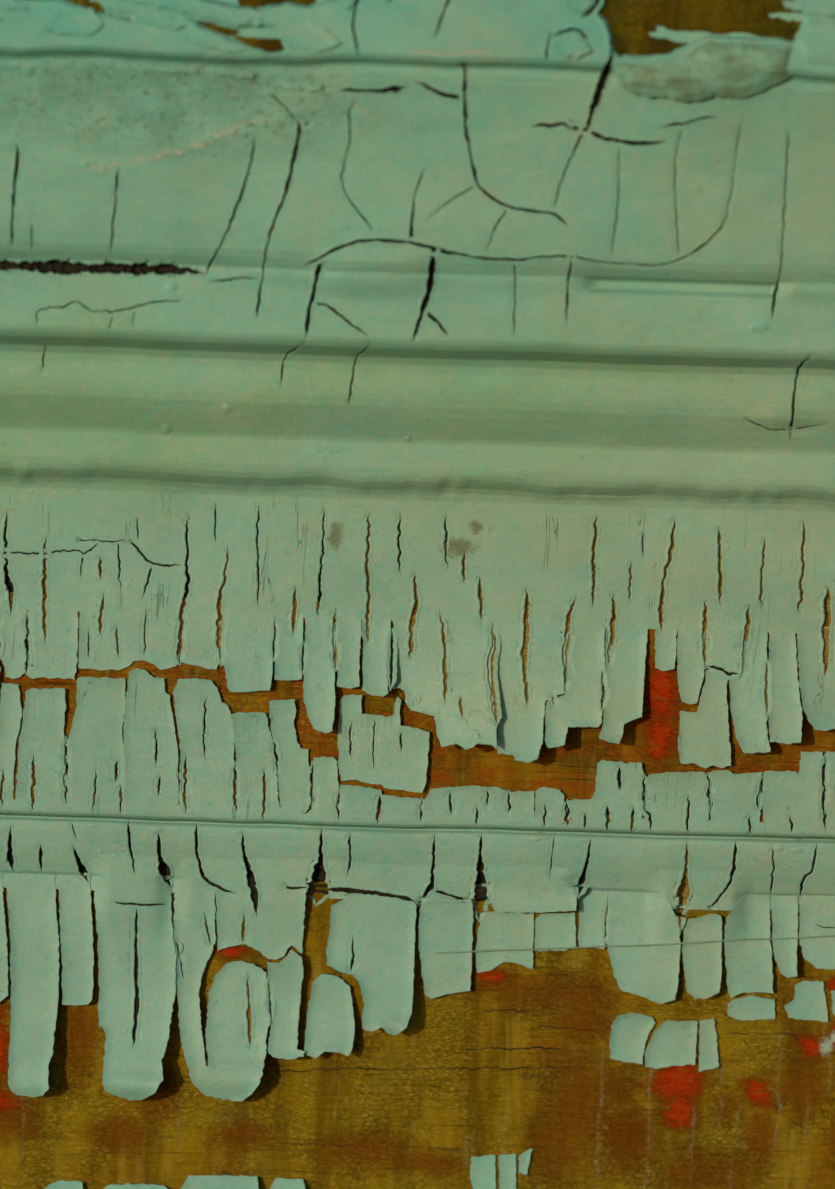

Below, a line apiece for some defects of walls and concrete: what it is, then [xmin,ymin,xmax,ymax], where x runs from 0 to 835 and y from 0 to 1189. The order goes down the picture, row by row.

peeling [38,0,340,52]
peeling [566,0,835,56]
crack [0,94,310,373]
crack [277,0,744,407]
crack [767,128,793,322]
crack [0,502,680,726]
peeling [0,606,835,829]
crack [698,519,835,721]
crack [0,696,835,1049]
peeling [0,873,835,1101]
peeling [104,1175,305,1189]
peeling [470,1149,533,1189]